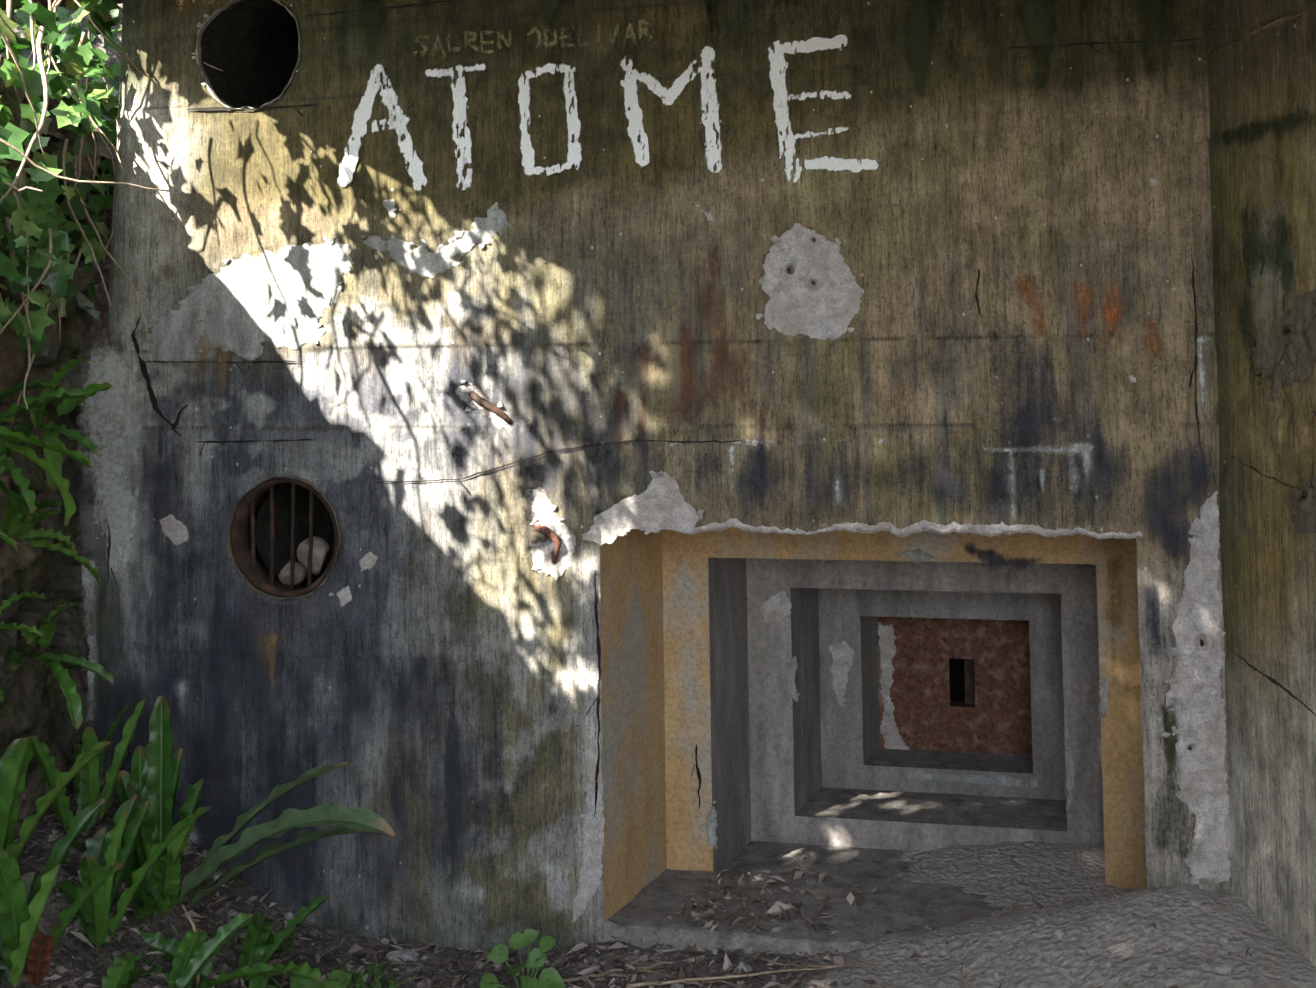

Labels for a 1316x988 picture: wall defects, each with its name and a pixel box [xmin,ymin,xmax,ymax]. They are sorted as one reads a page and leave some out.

peeling [143,199,512,366]
spalling [756,223,864,339]
crack [131,317,313,455]
spalling [525,470,1143,579]
spalling [1157,491,1231,889]
crack [1227,645,1316,716]